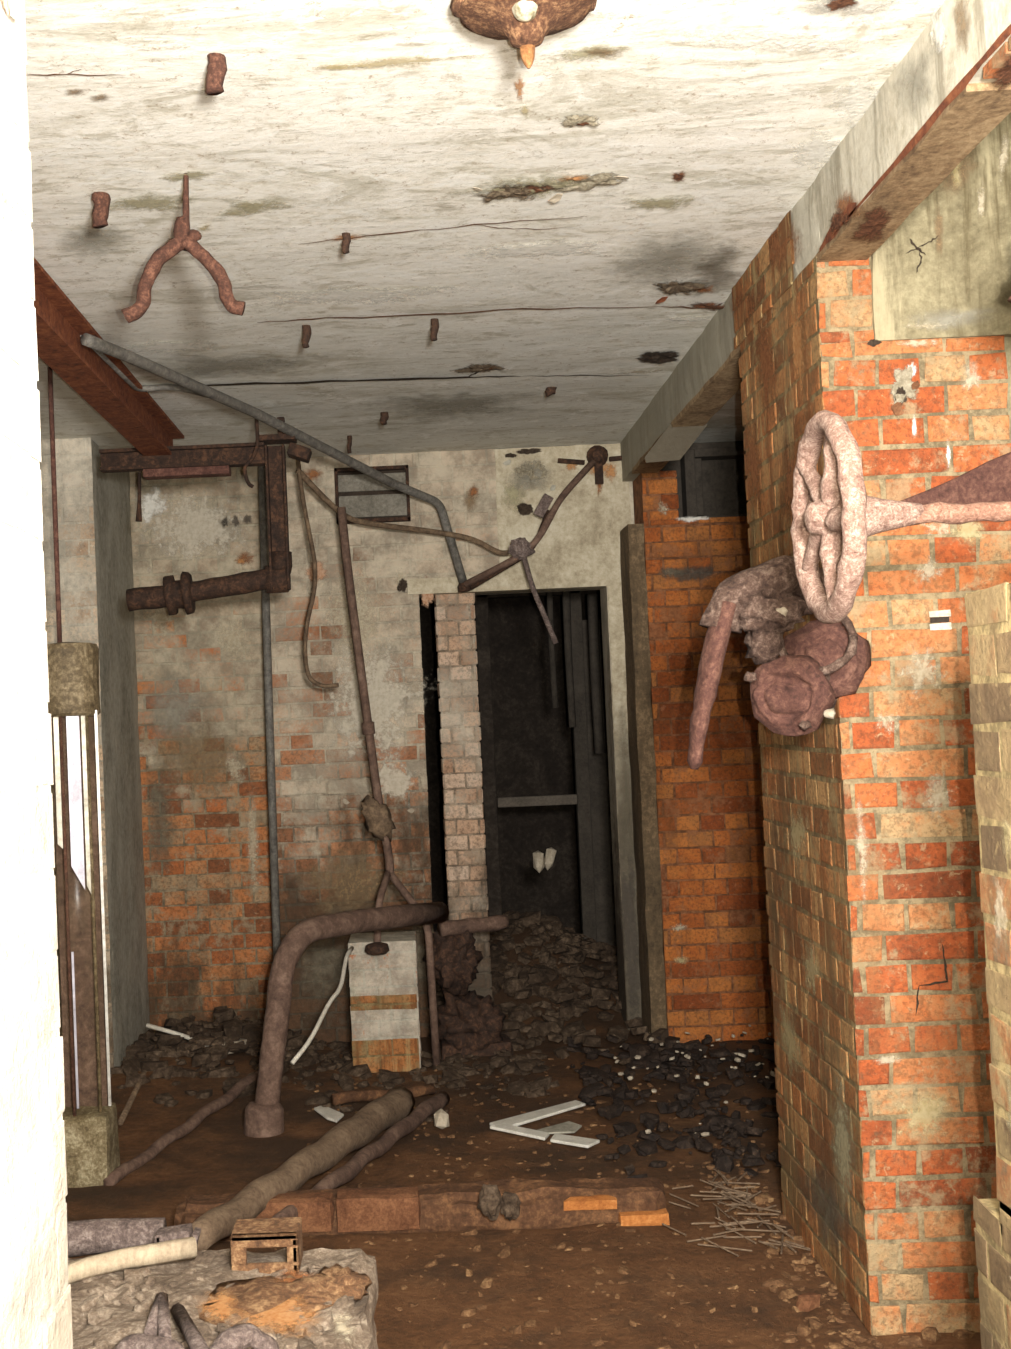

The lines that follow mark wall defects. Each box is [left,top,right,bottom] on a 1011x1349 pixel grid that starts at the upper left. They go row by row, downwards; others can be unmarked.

corrosion [816,0,894,14]
corrosion [819,24,1011,251]
spalling [473,173,629,203]
water stain [631,199,693,209]
water stain [631,244,734,286]